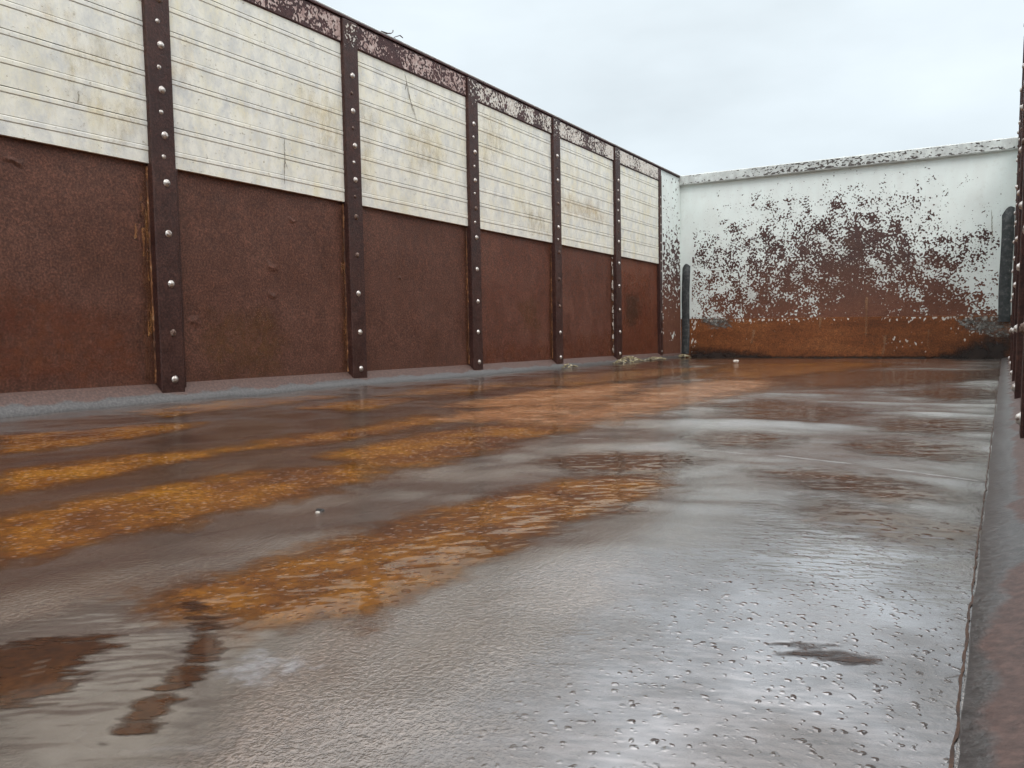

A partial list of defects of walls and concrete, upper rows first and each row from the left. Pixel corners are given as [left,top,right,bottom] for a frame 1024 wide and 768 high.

peeling [255,0,1015,354]